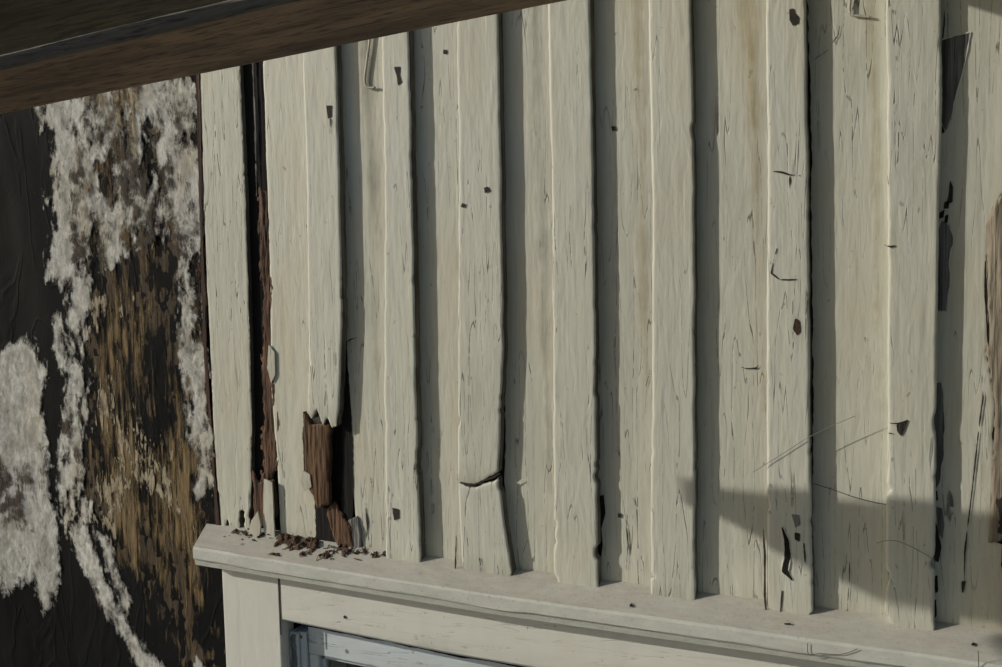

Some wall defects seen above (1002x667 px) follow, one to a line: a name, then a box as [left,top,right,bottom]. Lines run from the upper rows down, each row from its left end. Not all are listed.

peeling [940,11,971,133]
damp [68,86,160,274]
damp [158,97,199,277]
peeling [938,181,955,312]
damp [0,461,45,533]
peeling [248,479,276,537]
peeling [300,471,312,491]
crack [461,389,506,492]
peeling [781,514,800,581]